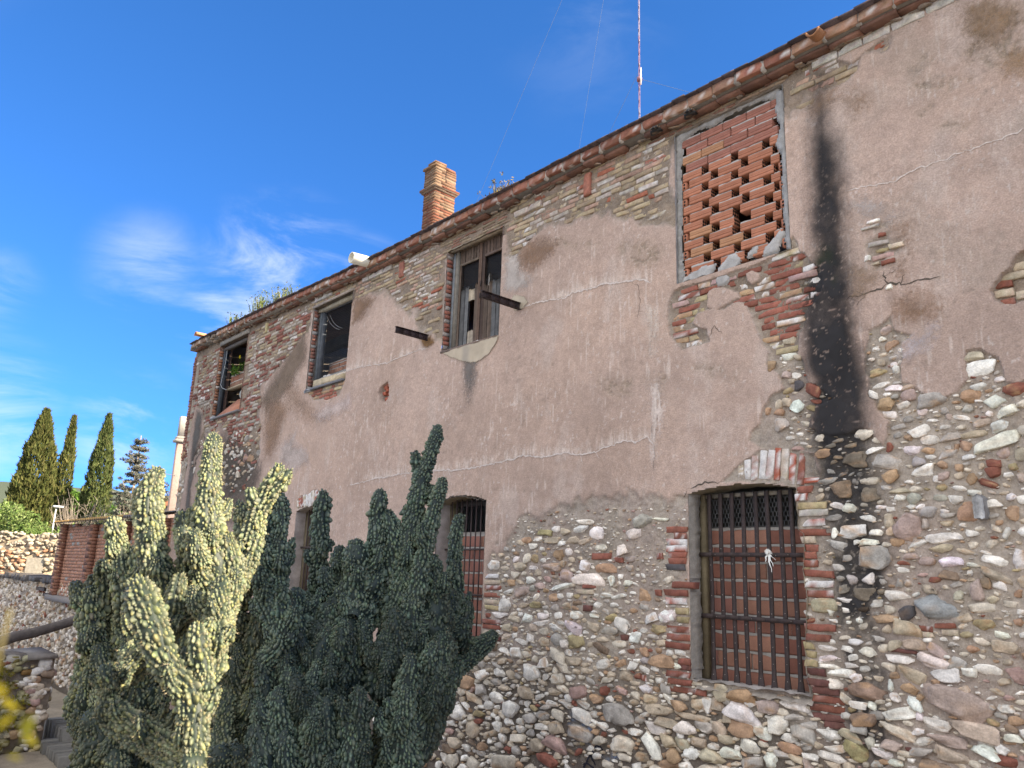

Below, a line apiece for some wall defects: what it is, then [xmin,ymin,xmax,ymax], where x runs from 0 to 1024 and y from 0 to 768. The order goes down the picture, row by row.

crack [847,128,1024,191]
peeling [175,28,892,511]
peeling [861,218,905,270]
crack [849,271,940,303]
crack [350,417,659,501]
peeling [423,237,1024,768]